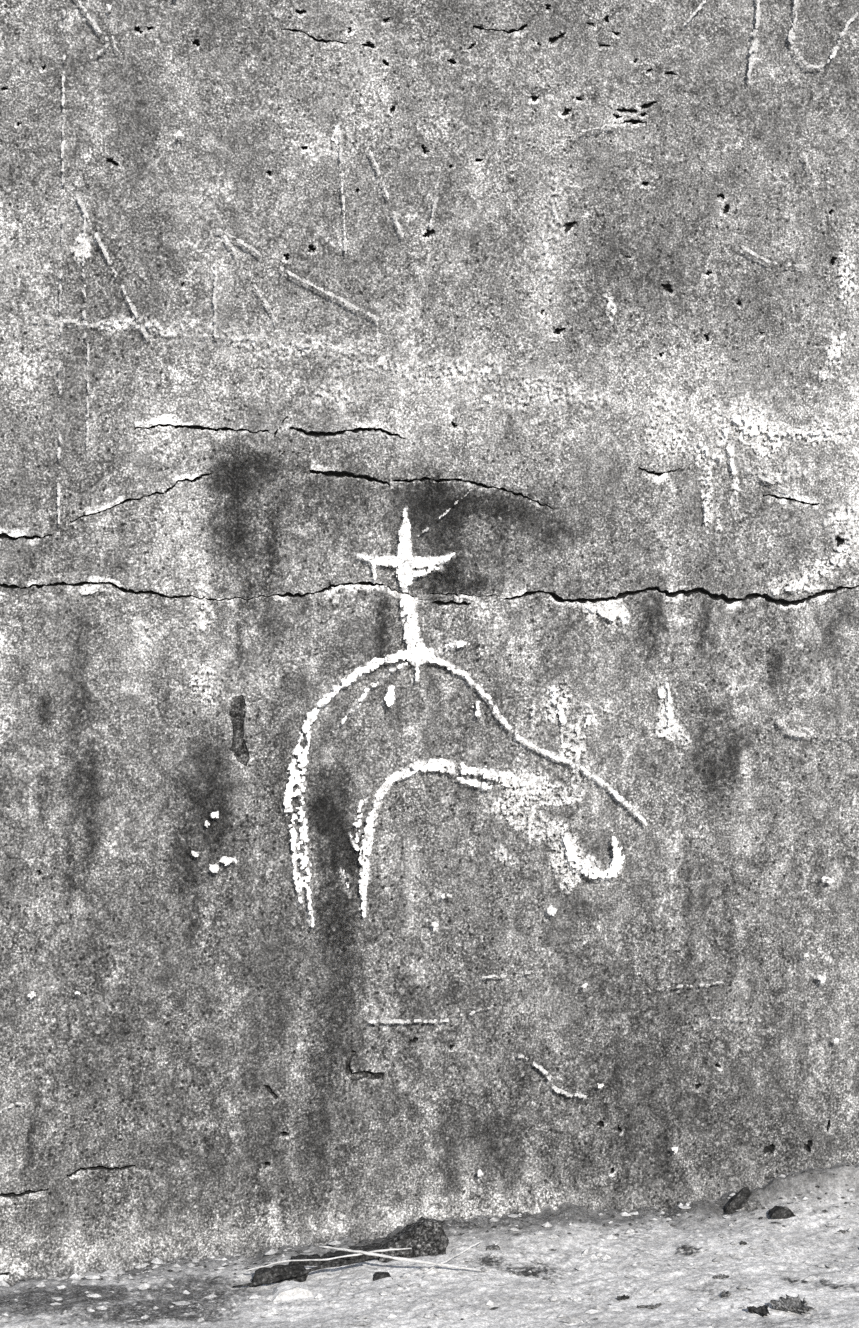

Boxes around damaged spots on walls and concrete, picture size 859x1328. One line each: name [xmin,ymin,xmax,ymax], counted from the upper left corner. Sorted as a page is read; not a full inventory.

water stain [137,620,164,650]
water stain [186,653,223,705]
water stain [190,577,223,634]
water stain [207,448,289,664]
crack [0,413,859,613]
water stain [169,736,234,899]
water stain [307,768,364,1059]
crack [0,1159,135,1208]